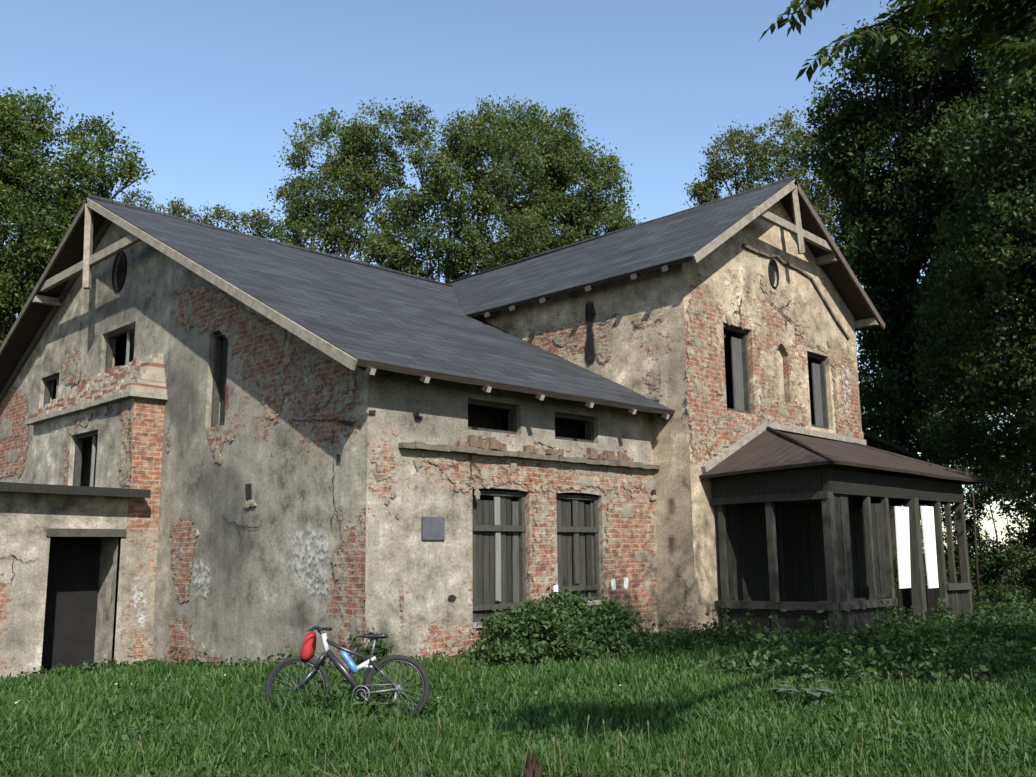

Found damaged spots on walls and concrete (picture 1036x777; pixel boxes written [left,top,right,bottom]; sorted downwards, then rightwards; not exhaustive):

flaking render [0,386,29,479]
crack [0,554,38,588]
flaking render [128,516,227,666]
flaking render [171,282,299,424]
crack [289,415,364,532]
flaking render [413,454,657,633]
flaking render [685,296,809,457]
flaking render [795,324,864,439]